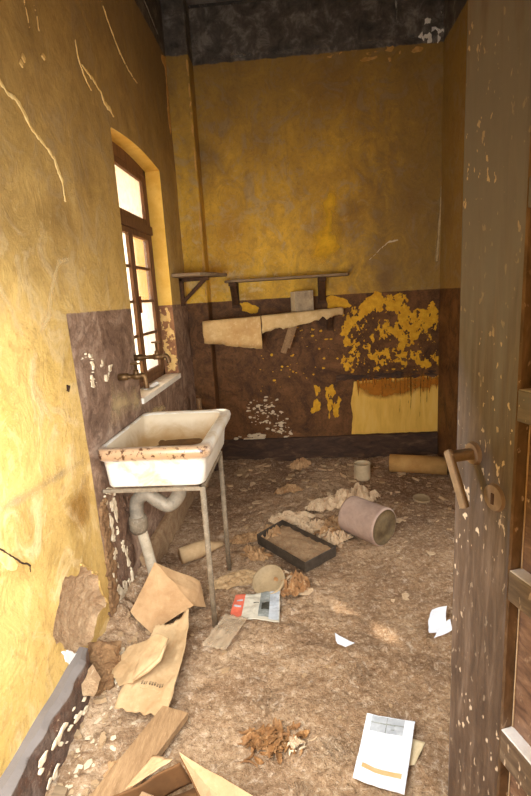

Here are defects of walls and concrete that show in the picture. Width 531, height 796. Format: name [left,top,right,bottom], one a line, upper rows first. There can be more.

crack [75,39,114,117]
crack [101,1,137,83]
peeling [412,18,444,53]
crack [0,79,66,202]
peeling [159,305,178,372]
peeling [272,291,439,383]
peeling [234,391,293,440]
peeling [311,384,342,419]
crack [0,548,31,572]
flaking render [53,487,136,664]
peeling [38,696,89,790]